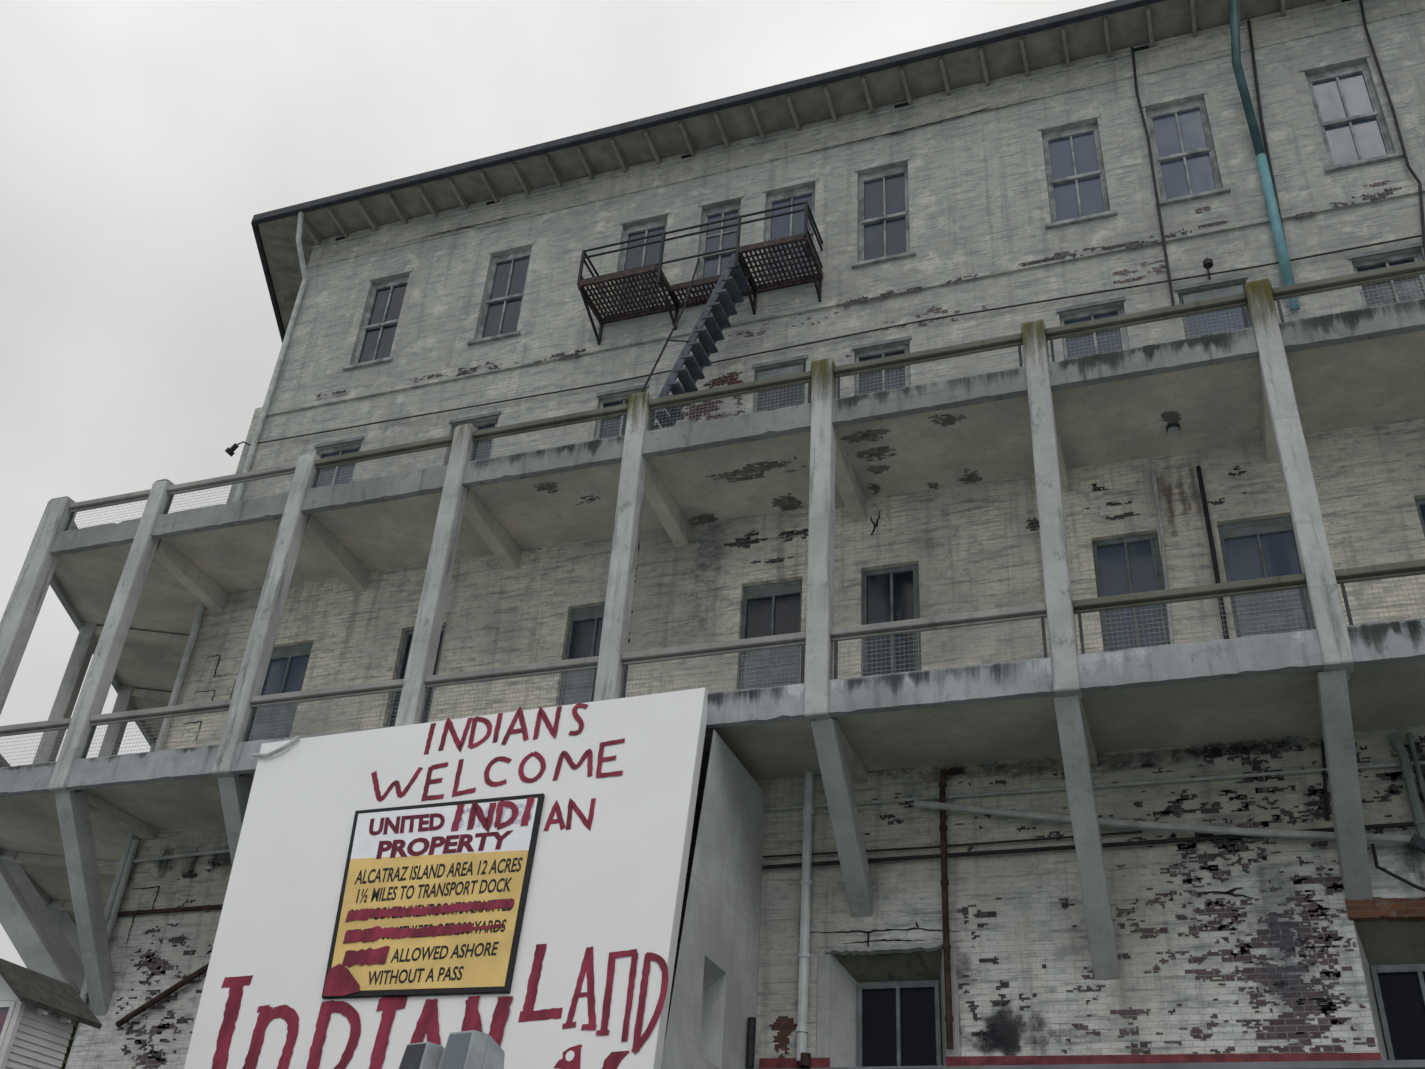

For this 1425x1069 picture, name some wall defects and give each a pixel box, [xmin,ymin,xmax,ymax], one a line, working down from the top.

peeling [928,414,967,427]
peeling [704,457,807,483]
peeling [840,429,897,495]
peeling [957,469,983,484]
peeling [772,493,803,512]
peeling [723,528,809,564]
peeling [872,793,914,825]
peeling [1355,736,1425,850]
peeling [957,898,1002,939]
spalling [1062,746,1376,1055]
peeling [116,900,213,1069]
water stain [974,1004,1043,1056]